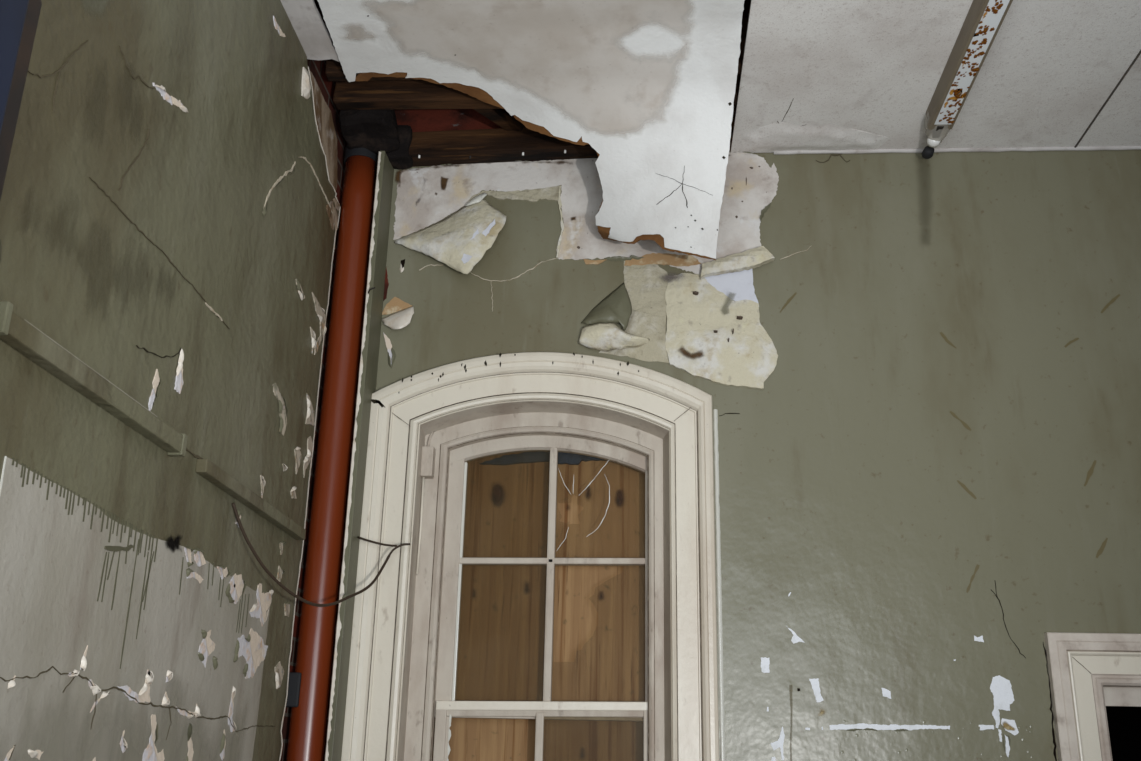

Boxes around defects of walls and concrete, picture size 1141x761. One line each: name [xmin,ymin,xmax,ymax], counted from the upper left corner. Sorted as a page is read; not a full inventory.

damp [348,26,373,40]
damp [367,0,692,134]
corrosion [939,0,1003,124]
crack [89,129,230,329]
peeling [393,151,779,389]
peeling [0,67,340,761]
crack [0,666,275,740]
peeling [761,657,770,673]
peeling [770,726,785,761]
peeling [809,678,823,702]
peeling [805,723,950,732]
peeling [979,675,1019,757]